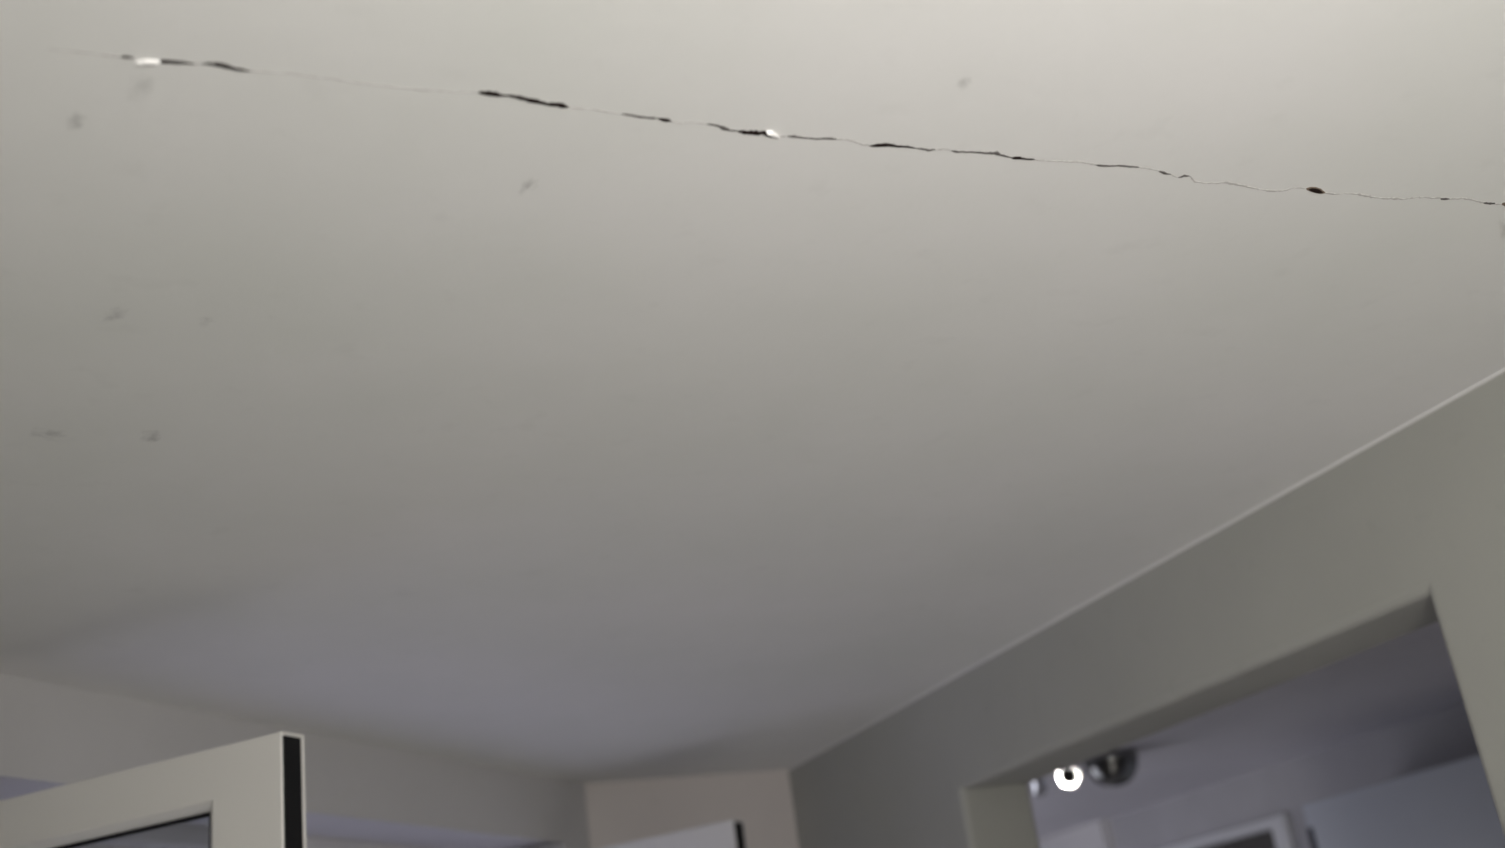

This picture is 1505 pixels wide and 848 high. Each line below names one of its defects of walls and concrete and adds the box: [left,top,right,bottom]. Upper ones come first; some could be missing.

crack [48,49,1502,205]